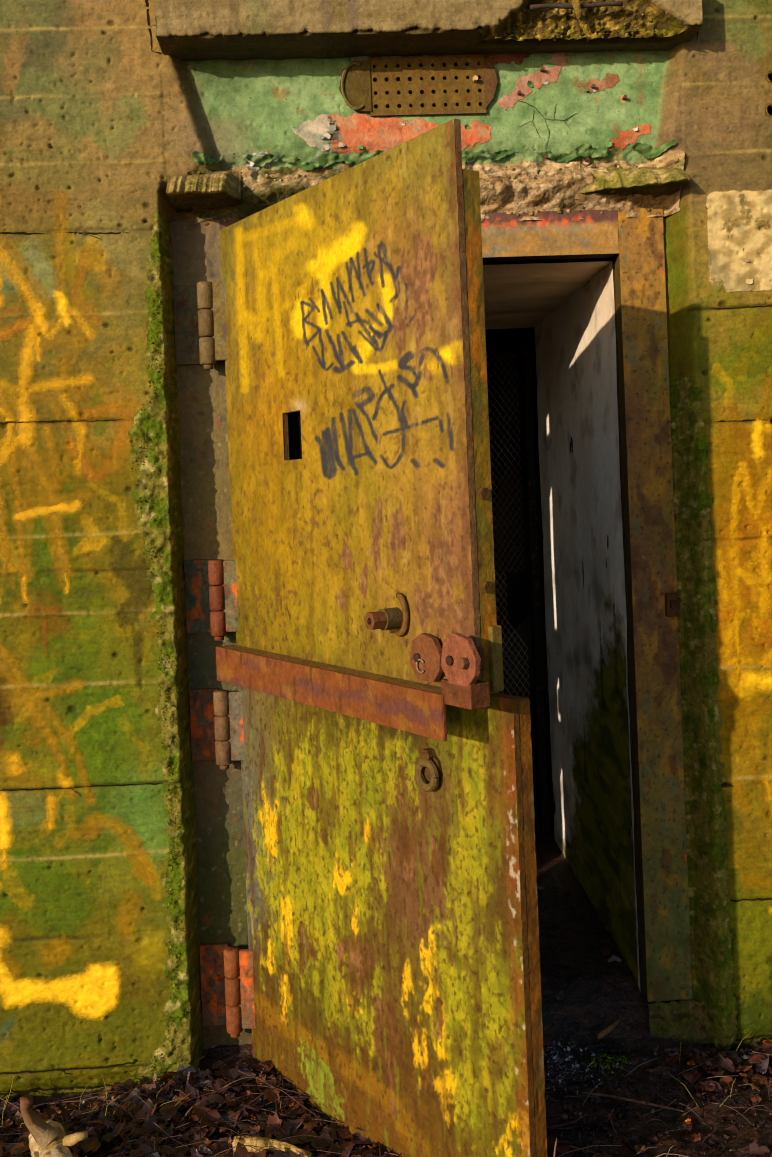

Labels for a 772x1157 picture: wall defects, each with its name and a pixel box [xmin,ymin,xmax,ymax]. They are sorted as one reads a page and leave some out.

spalling [466,0,688,110]
spalling [187,113,439,226]
crack [514,99,573,148]
spalling [461,121,685,222]